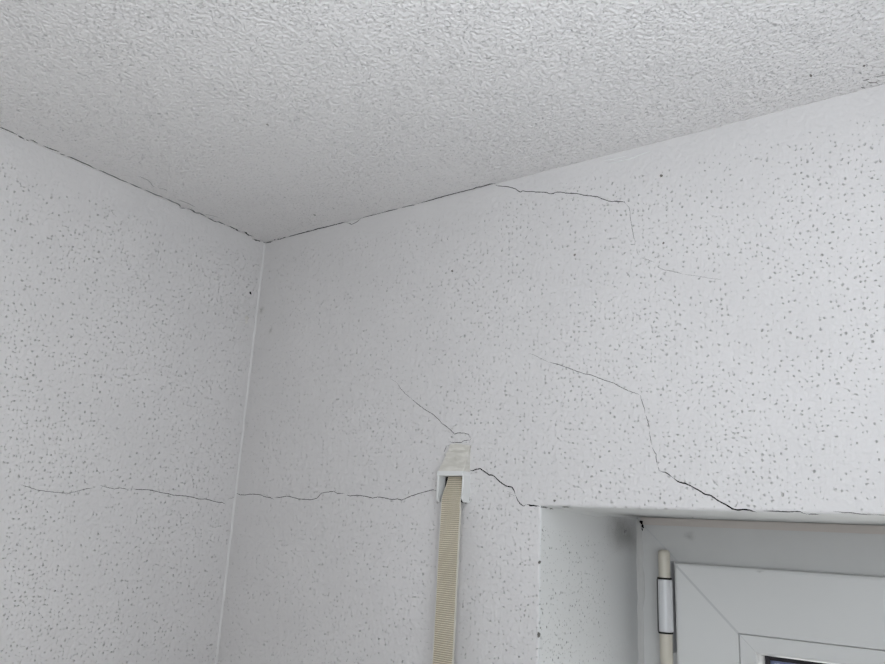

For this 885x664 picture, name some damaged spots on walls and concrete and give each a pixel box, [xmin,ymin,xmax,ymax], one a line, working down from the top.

crack [0,127,634,243]
crack [393,380,471,451]
crack [532,354,879,515]
crack [23,485,436,503]
crack [470,468,552,509]